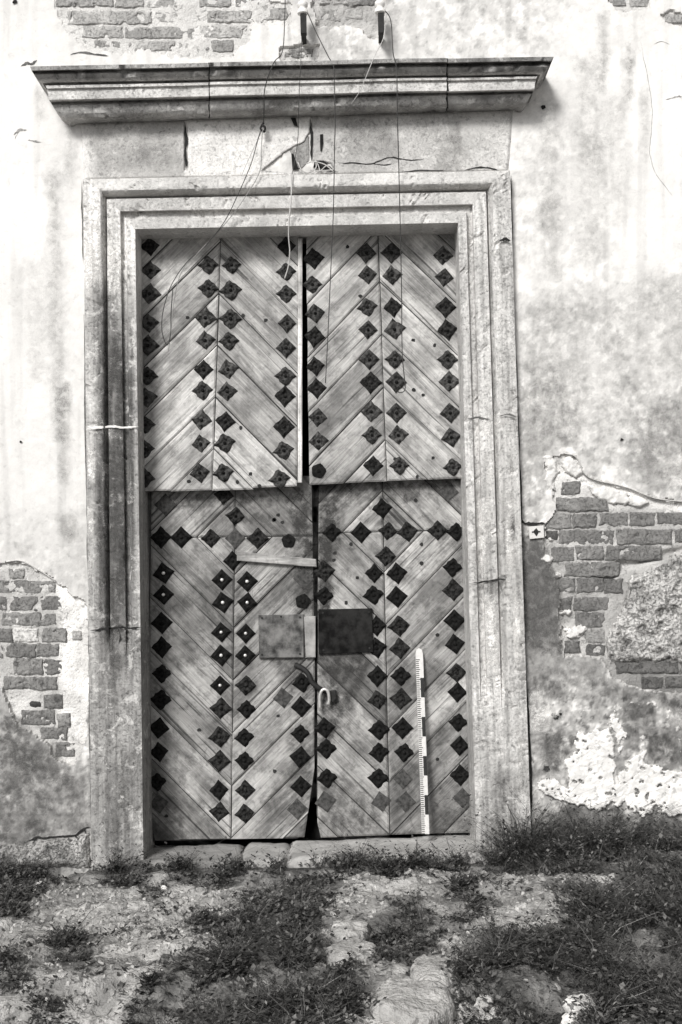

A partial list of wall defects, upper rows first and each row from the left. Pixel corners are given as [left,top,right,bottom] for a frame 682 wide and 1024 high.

flaking render [55,0,292,59]
flaking render [280,46,319,61]
crack [182,126,190,169]
crack [307,119,315,161]
crack [344,157,513,246]
crack [468,338,546,526]
peeling [505,501,515,559]
flaking render [0,560,89,765]
peeling [486,597,498,665]
flaking render [543,453,682,752]
crack [525,676,533,811]
peeling [520,710,682,817]